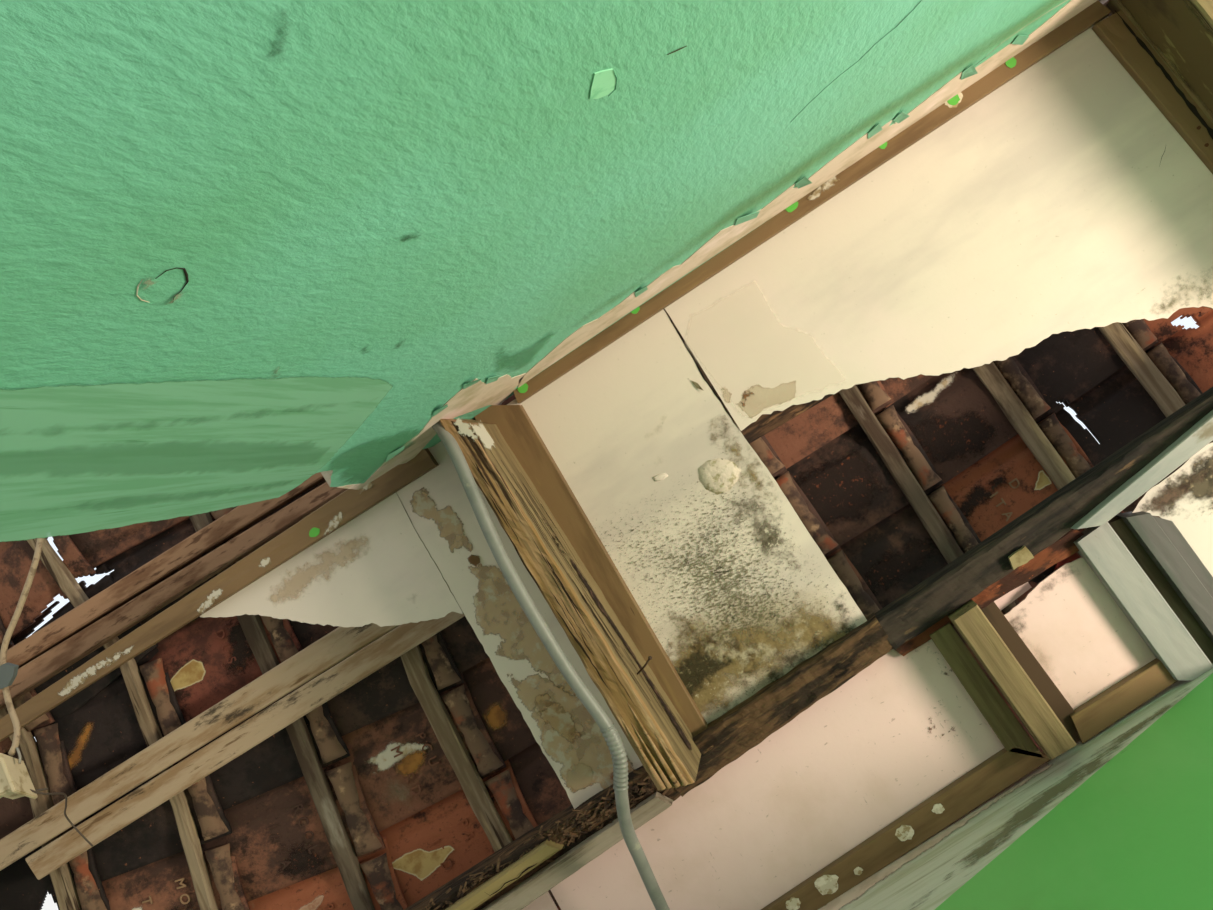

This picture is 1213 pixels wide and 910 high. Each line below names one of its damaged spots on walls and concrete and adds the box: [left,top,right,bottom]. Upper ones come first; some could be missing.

crack [806,0,922,106]
peeling [337,0,1108,490]
crack [667,315,739,430]
water stain [1143,449,1213,515]
water stain [600,423,854,723]
peeling [818,763,1052,910]